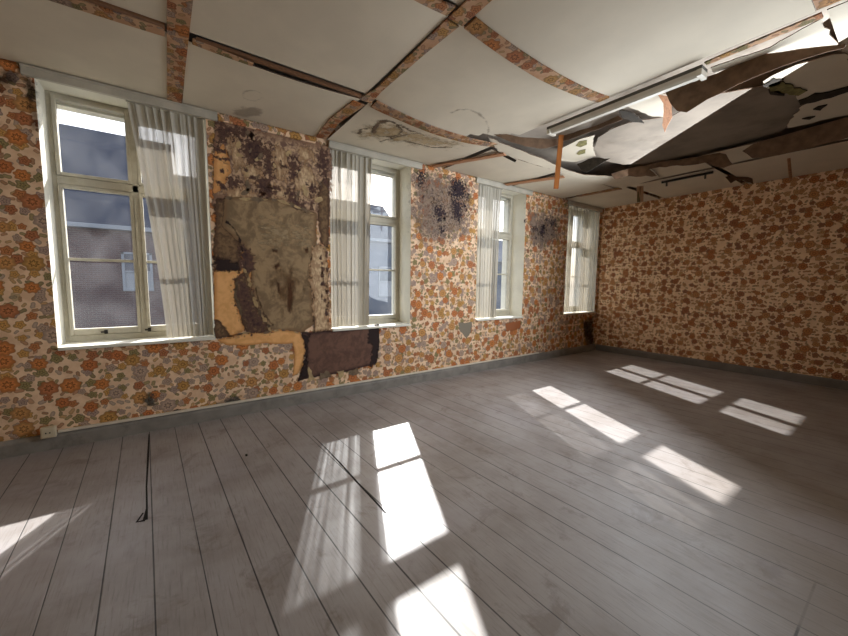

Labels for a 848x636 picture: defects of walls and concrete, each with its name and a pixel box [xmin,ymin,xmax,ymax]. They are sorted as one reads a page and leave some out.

flaking render [222,197,317,333]
damp [211,117,333,220]
damp [413,171,472,238]
damp [524,210,558,247]